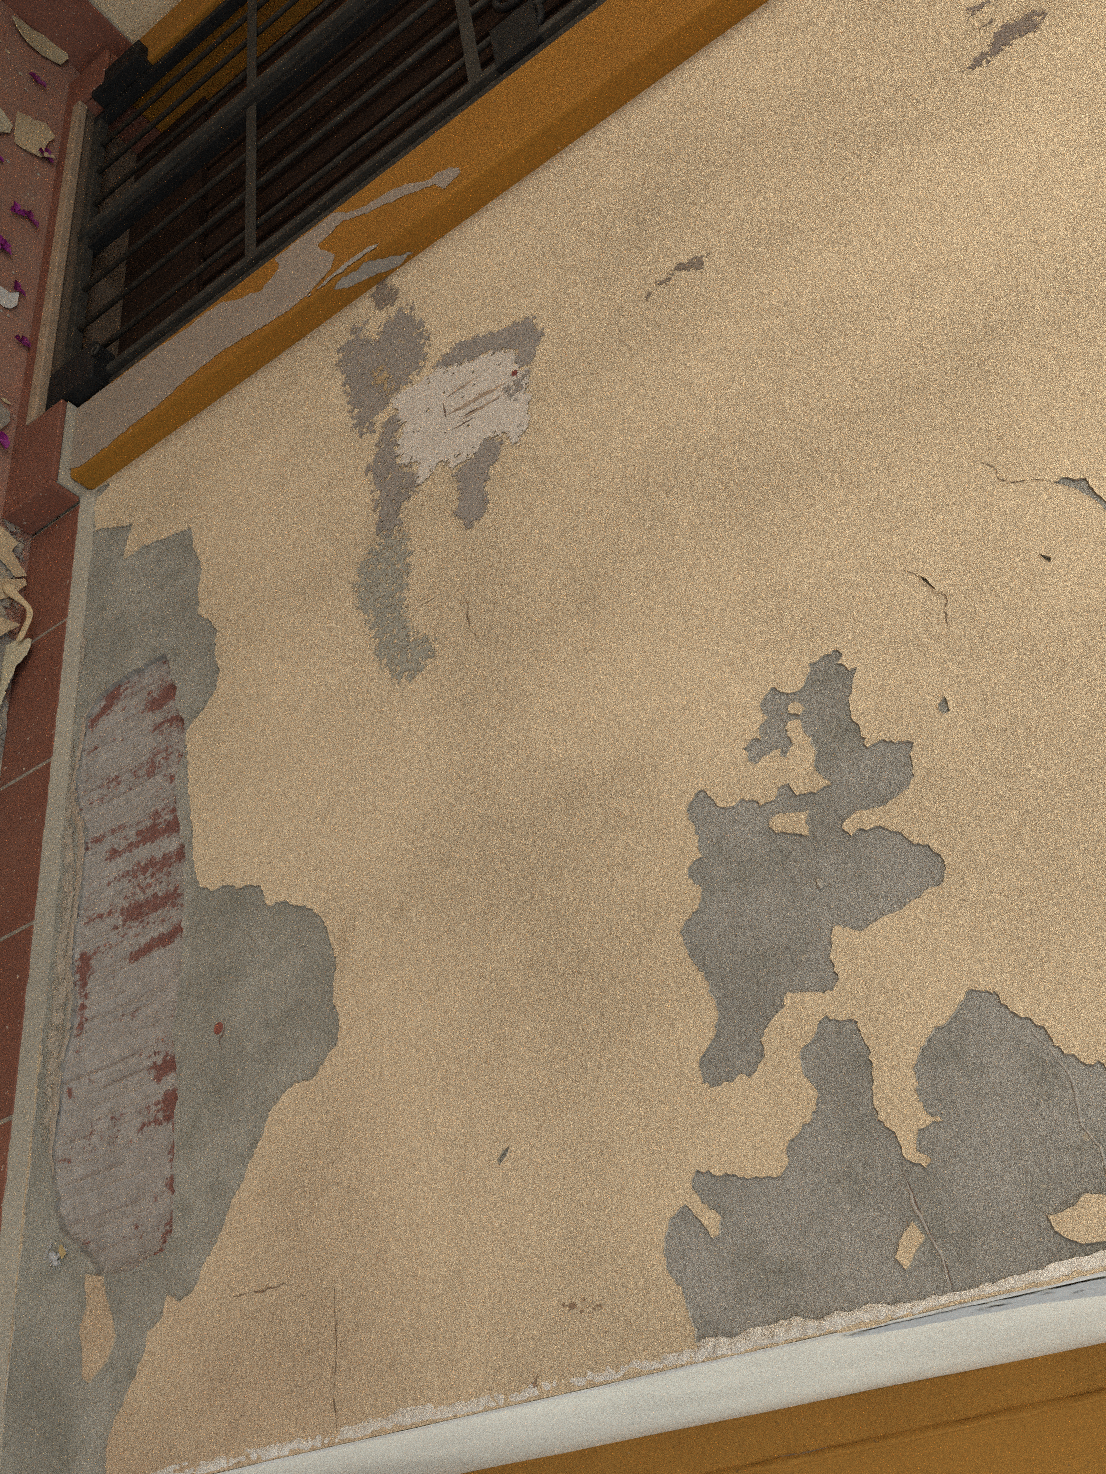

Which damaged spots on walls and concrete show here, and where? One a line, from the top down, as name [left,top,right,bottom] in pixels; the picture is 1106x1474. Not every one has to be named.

peeling [69,167,545,541]
crack [969,455,1051,490]
peeling [0,481,340,1474]
peeling [678,648,947,1091]
peeling [936,694,953,717]
peeling [663,989,1106,1363]